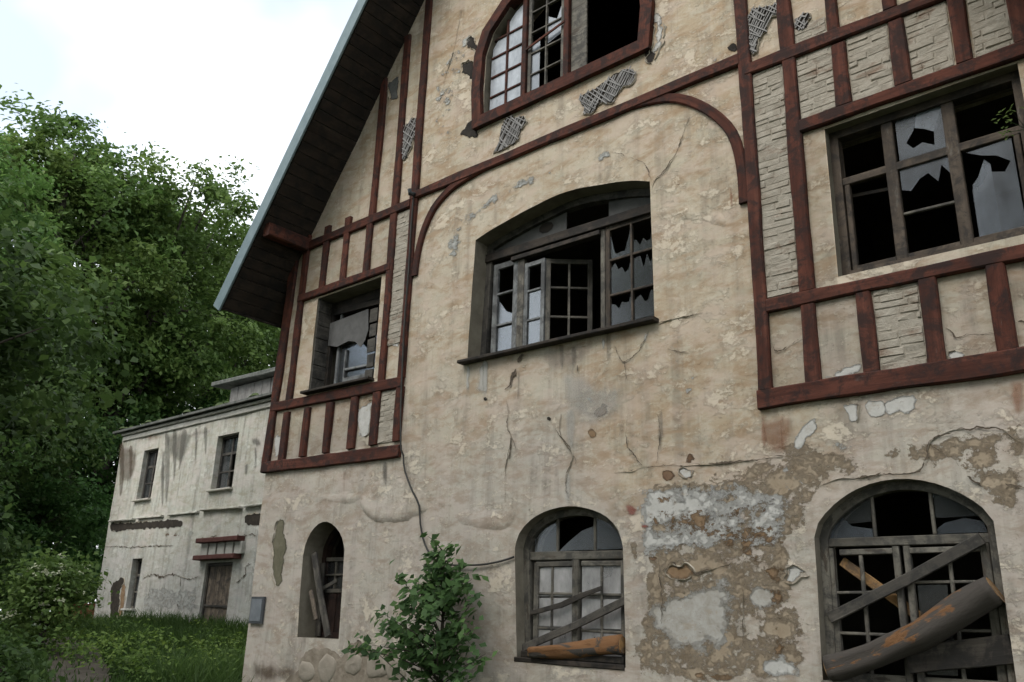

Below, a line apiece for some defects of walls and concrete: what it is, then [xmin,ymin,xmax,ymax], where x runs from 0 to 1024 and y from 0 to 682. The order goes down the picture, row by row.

peeling [644,13,667,64]
peeling [436,35,478,138]
crack [618,118,690,188]
crack [616,313,699,380]
crack [504,354,527,502]
crack [555,414,576,496]
crack [619,397,791,490]
peeling [843,395,917,422]
peeling [885,421,1024,510]
spalling [110,519,183,536]
peeling [631,418,864,682]